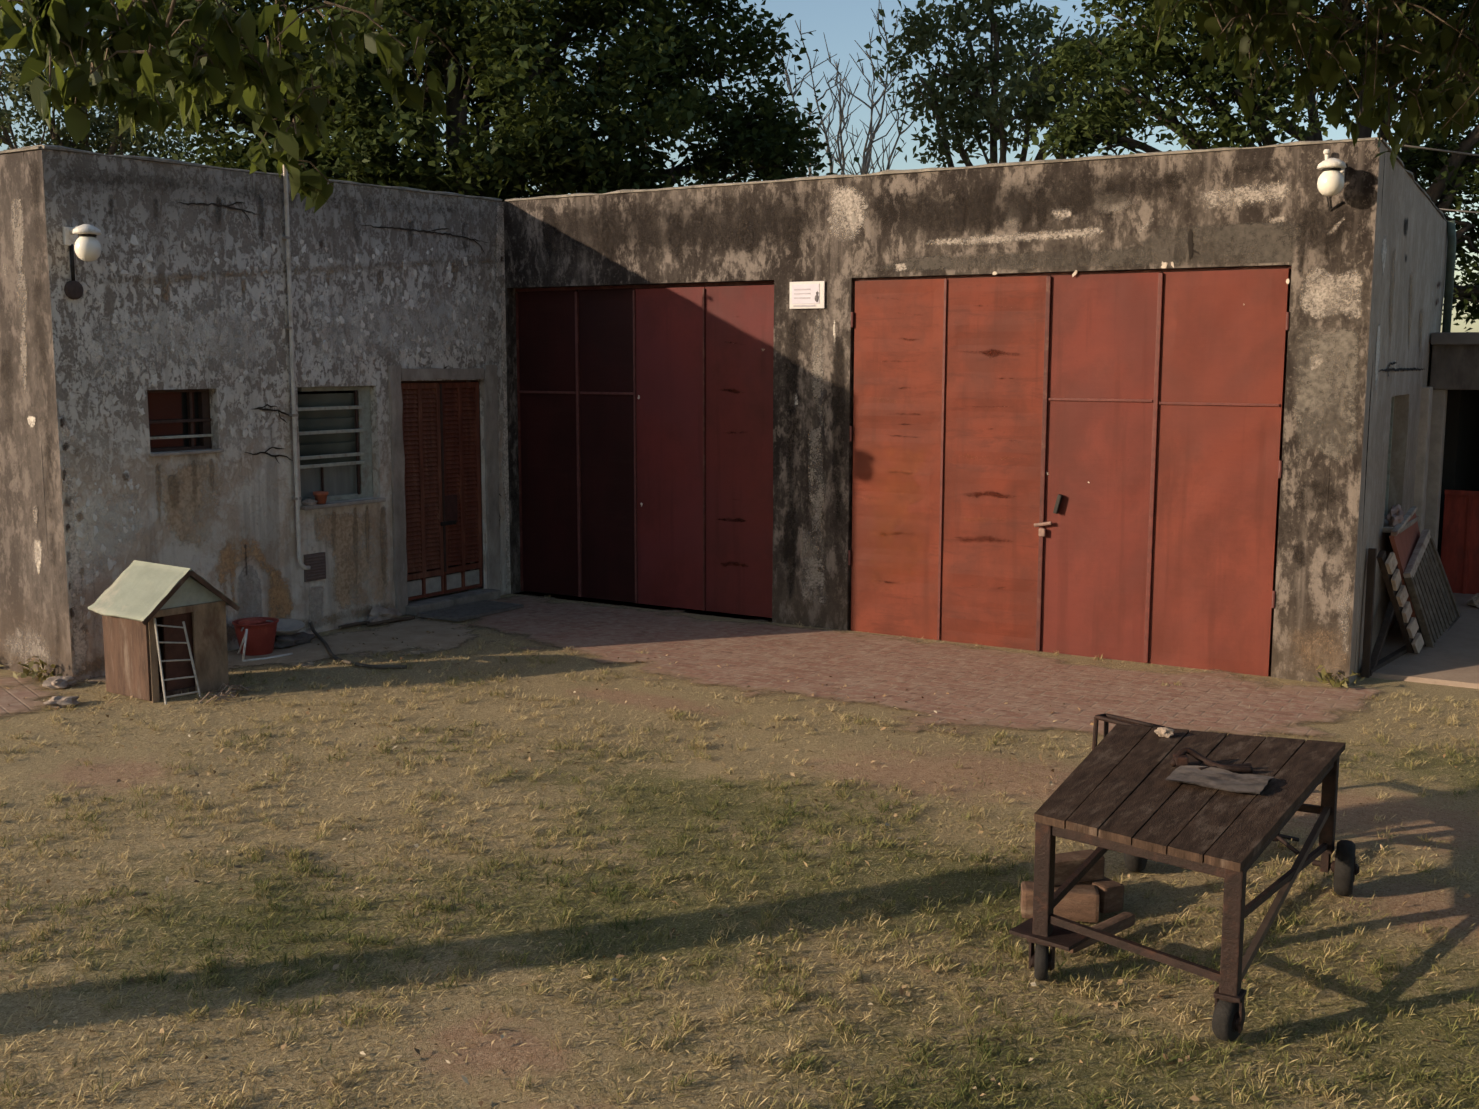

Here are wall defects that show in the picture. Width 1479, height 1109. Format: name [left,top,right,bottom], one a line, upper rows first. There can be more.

water stain [1,175,37,390]
peeling [75,235,281,439]
peeling [293,206,510,586]
water stain [542,195,815,261]
water stain [8,630,50,669]
spalling [60,418,140,674]
corrosion [218,540,293,619]
water stain [1293,542,1305,570]